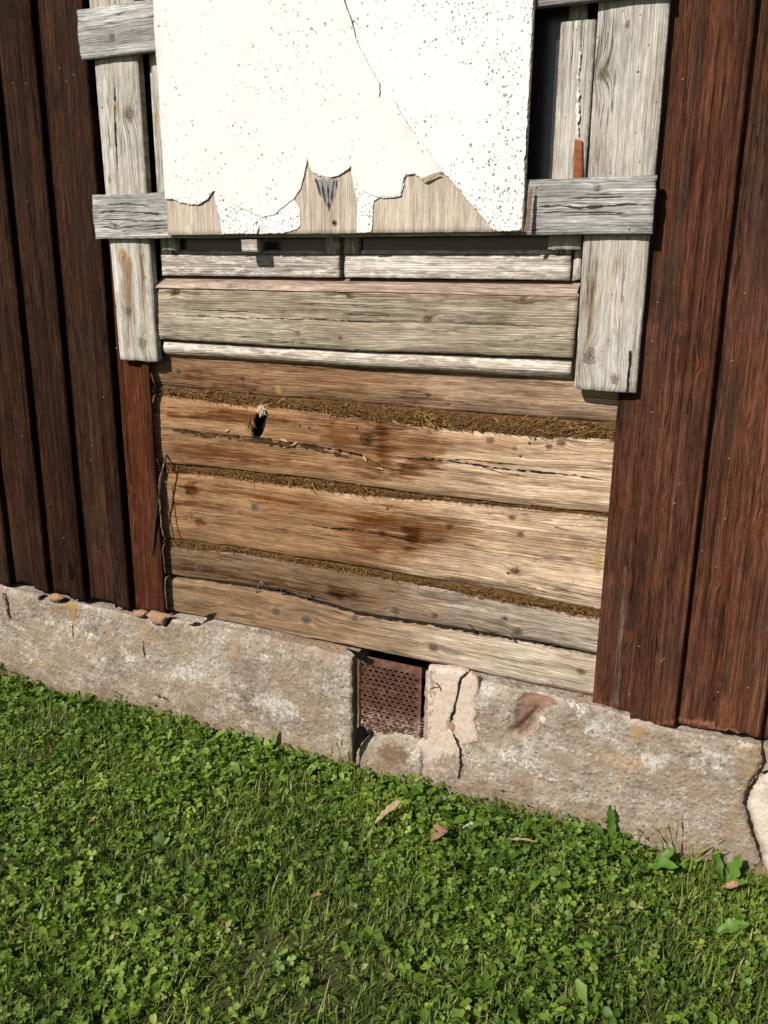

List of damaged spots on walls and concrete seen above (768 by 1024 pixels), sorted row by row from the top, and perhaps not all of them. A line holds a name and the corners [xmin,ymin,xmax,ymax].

peeling [153,0,533,234]
crack [164,427,603,480]
crack [431,671,468,779]
crack [743,734,768,866]